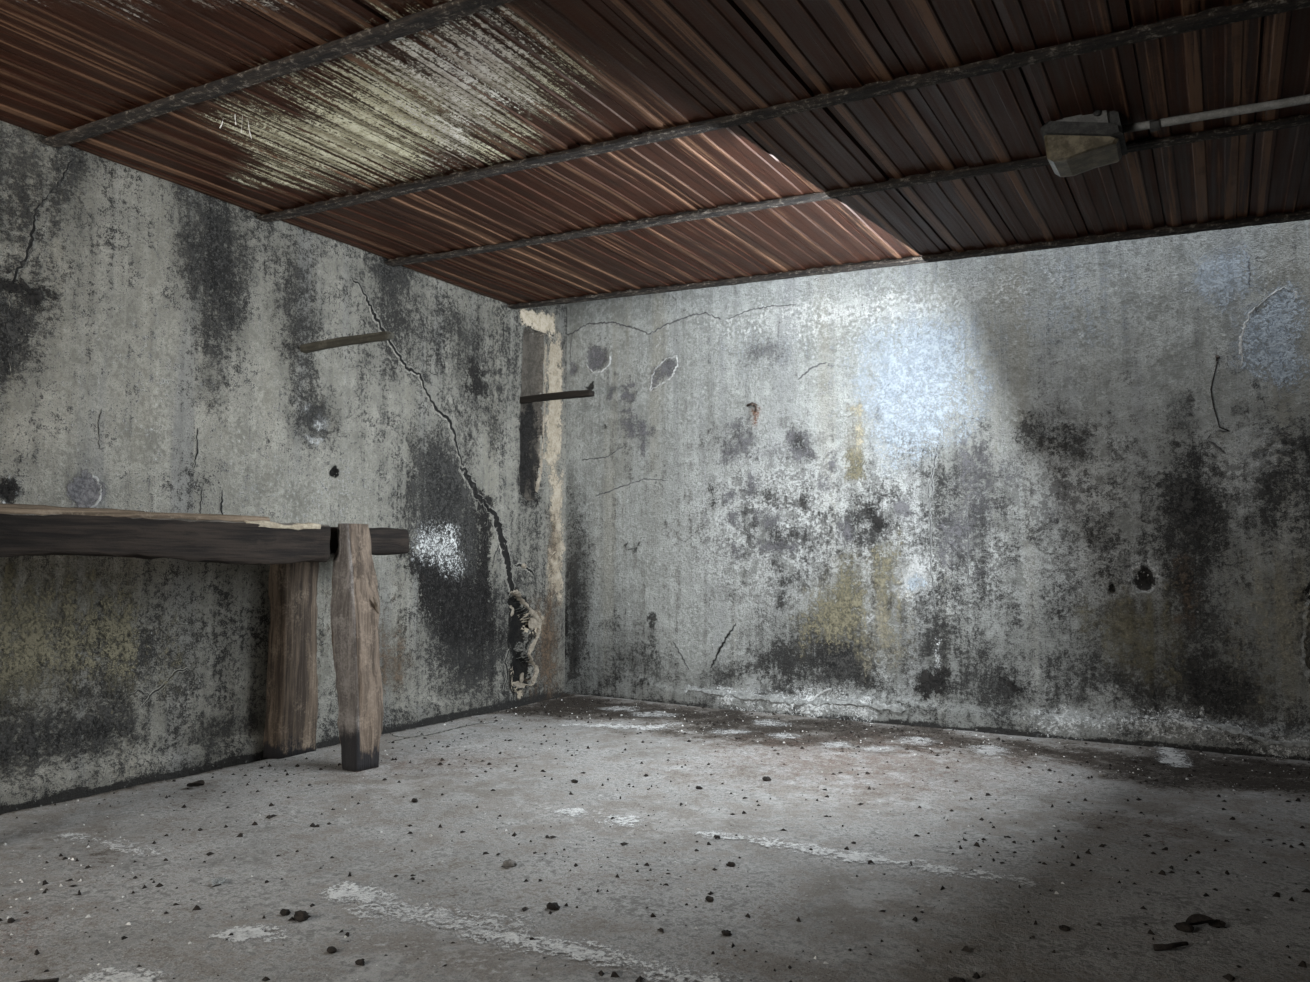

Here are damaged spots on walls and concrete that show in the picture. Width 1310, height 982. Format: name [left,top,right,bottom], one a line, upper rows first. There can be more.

water stain [199,5,600,192]
crack [8,157,74,371]
water stain [0,122,103,418]
water stain [0,555,185,786]
crack [350,277,515,598]
water stain [393,297,507,713]
spalling [503,588,551,699]
water stain [708,417,804,561]
water stain [776,403,927,692]
water stain [822,737,931,751]
water stain [913,612,951,700]
water stain [1050,410,1310,754]